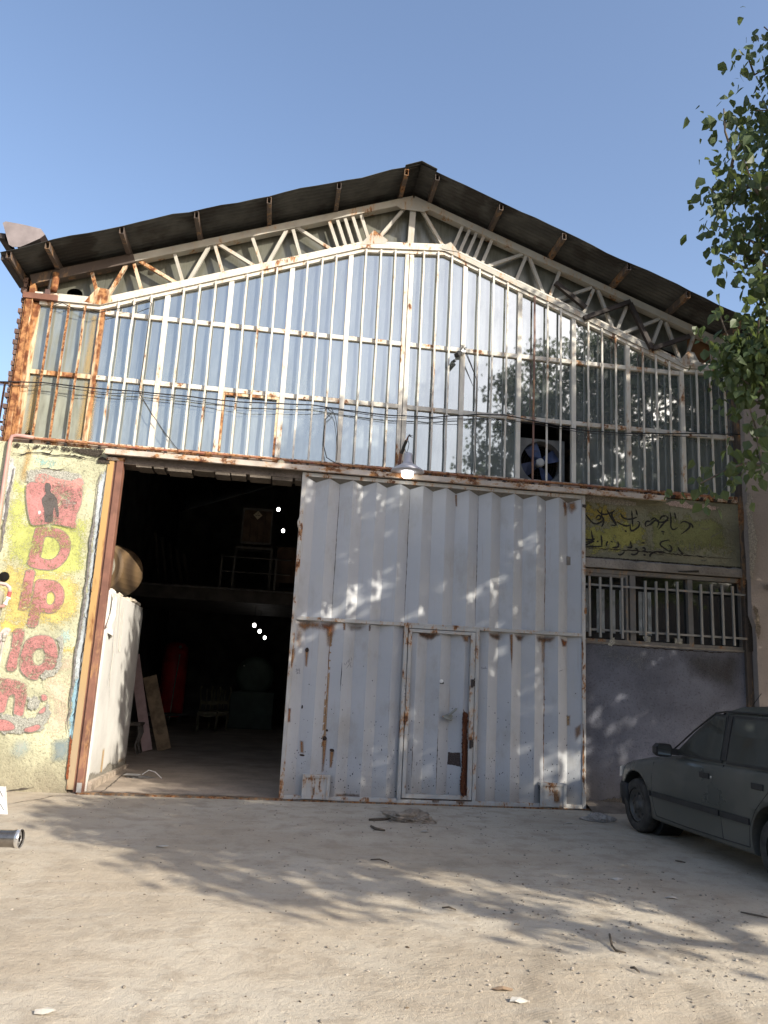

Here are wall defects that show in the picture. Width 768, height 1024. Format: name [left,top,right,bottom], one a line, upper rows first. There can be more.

corrosion [27,377,39,431]
flaking render [13,443,110,464]
corrosion [299,623,370,746]
corrosion [422,709,468,803]